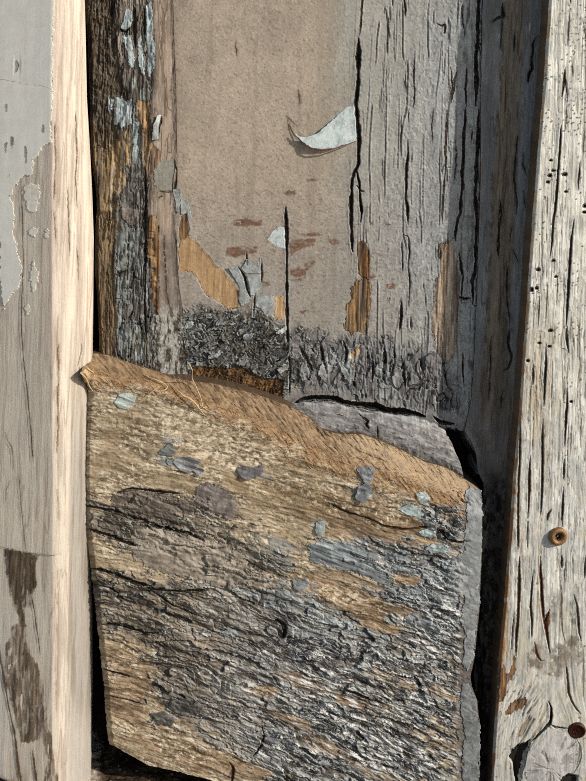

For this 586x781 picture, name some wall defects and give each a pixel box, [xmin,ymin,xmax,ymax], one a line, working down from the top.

peeling [0,0,55,309]
peeling [121,2,156,77]
peeling [90,96,410,394]
crack [349,0,364,252]
crack [284,208,470,437]
crack [399,57,416,330]
crack [431,0,536,305]
crack [550,64,574,353]
peeling [110,442,310,599]
peeling [260,635,481,781]
peeling [397,484,484,671]
crack [511,422,584,714]